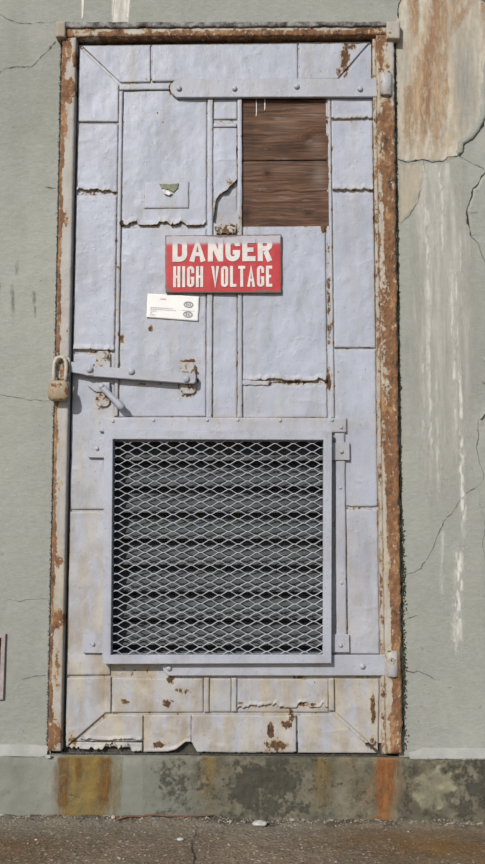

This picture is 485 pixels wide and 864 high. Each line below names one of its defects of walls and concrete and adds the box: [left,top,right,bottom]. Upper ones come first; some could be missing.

leakage [112,0,130,22]
crack [1,16,55,72]
crack [398,61,485,261]
leakage [412,162,473,653]
crack [409,432,485,574]
corrosion [58,755,116,816]
leakage [156,757,326,821]
corrosion [369,758,398,820]